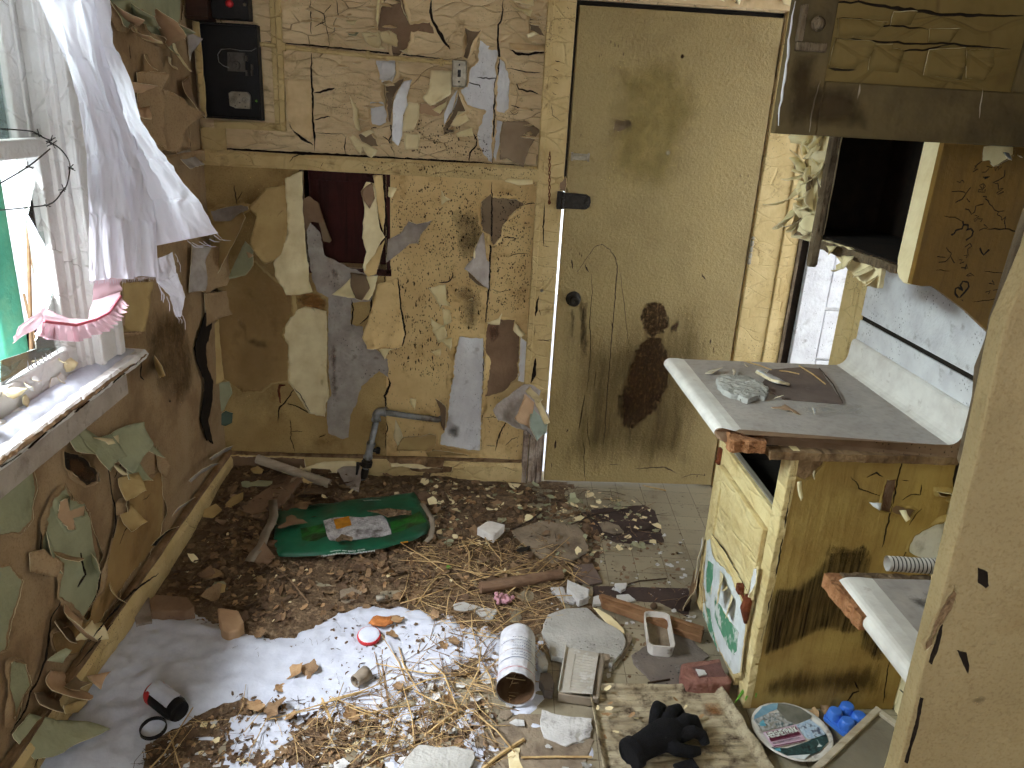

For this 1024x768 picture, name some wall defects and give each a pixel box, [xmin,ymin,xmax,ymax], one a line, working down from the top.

peeling [110,0,206,169]
crack [290,0,346,166]
crack [429,0,450,49]
peeling [346,0,540,289]
crack [837,0,1024,52]
peeling [0,354,165,467]
spalling [189,170,432,482]
leakage [593,302,680,454]
crack [852,472,922,525]
peeling [0,422,195,760]
leakage [766,546,881,660]
leakage [773,669,874,691]